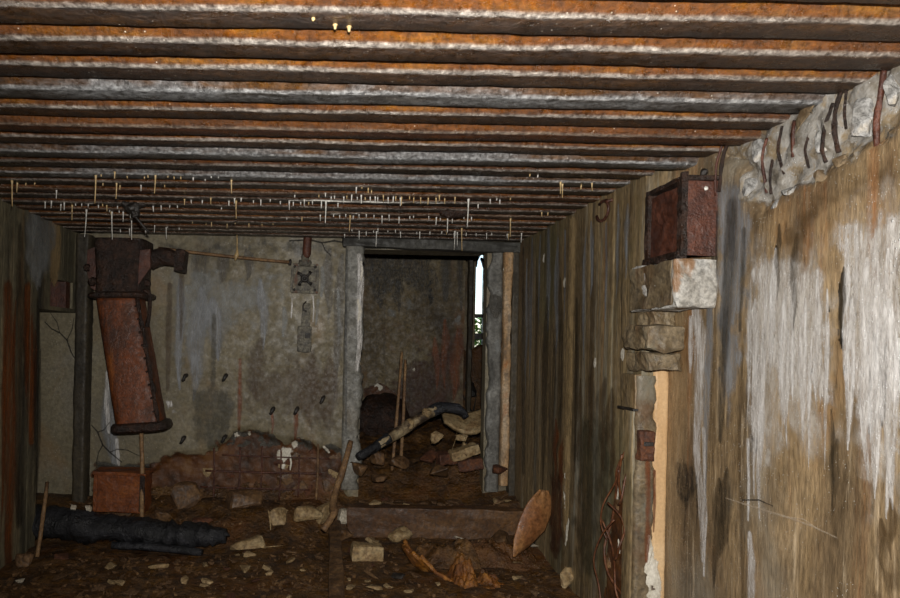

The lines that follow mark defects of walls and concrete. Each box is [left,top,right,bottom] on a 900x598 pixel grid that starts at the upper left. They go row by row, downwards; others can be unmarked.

spalling [714,66,900,209]
corrosion [0,282,37,563]
crack [45,313,75,359]
water stain [176,245,280,447]
water stain [677,188,900,585]